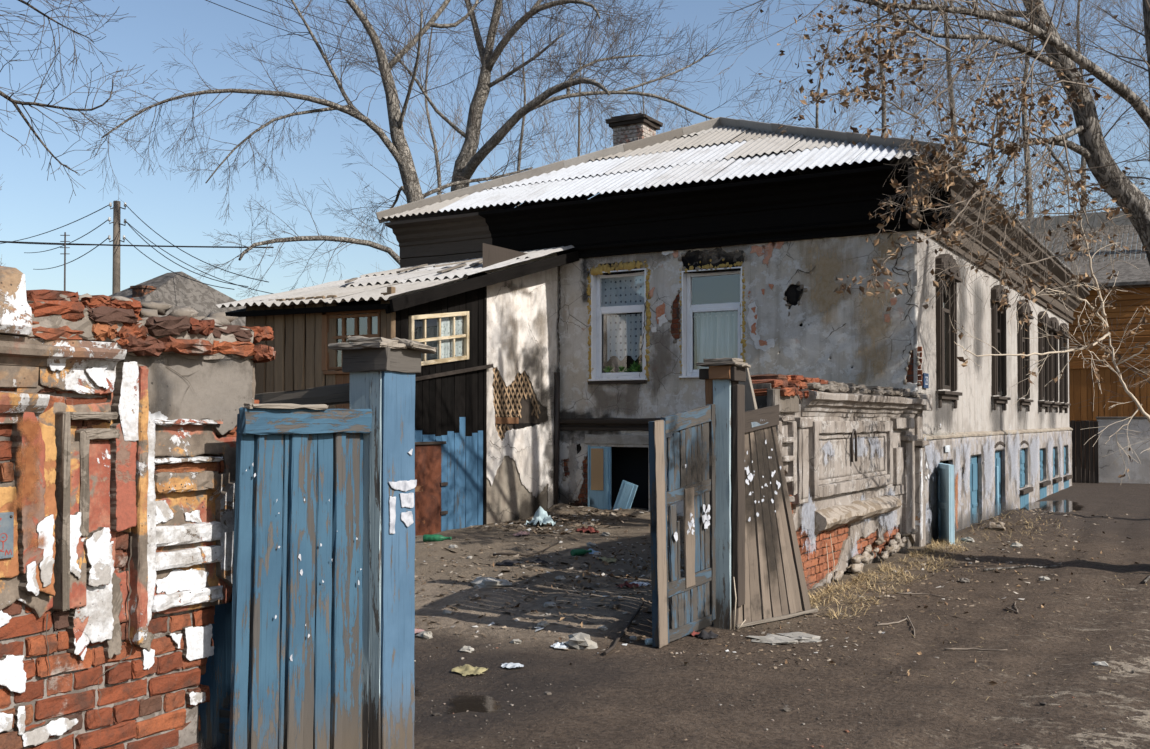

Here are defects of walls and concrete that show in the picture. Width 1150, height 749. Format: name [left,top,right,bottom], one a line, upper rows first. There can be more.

spalling [662,241,784,273]
damp [509,319,518,362]
flaking render [84,365,109,390]
spalling [492,367,541,440]
damp [542,369,559,490]
flaking render [0,610,12,627]
flaking render [18,514,55,596]
flaking render [66,512,214,670]
flaking render [156,500,202,524]
spalling [789,495,899,588]
flaking render [0,654,78,747]
flaking render [185,691,206,705]